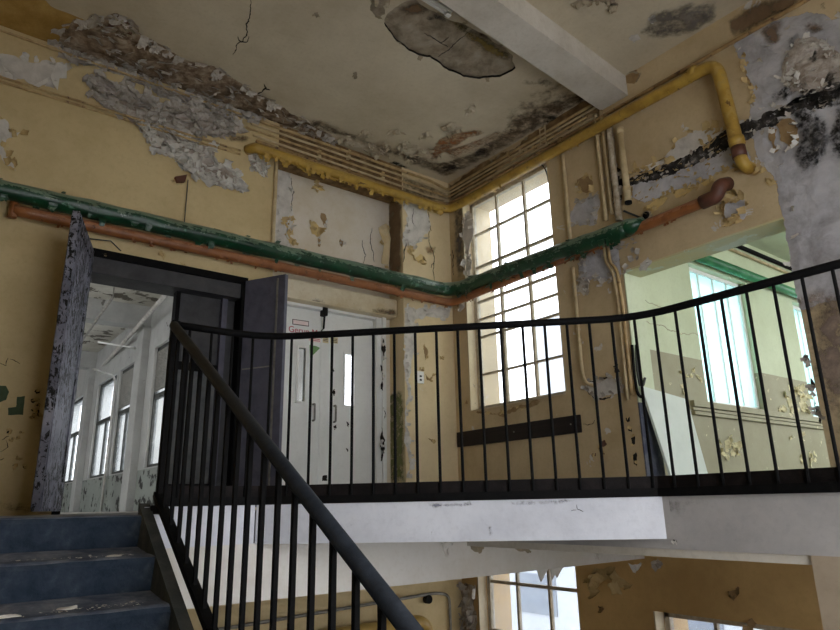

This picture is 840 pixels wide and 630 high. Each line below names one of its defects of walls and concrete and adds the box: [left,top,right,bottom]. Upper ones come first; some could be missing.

crack [233,0,251,54]
damp [646,5,713,36]
spalling [0,13,441,247]
peeling [369,189,444,265]
damp [378,96,582,202]
spalling [605,119,739,214]
peeling [713,188,749,227]
spalling [734,11,840,310]
mould [777,73,840,167]
spalling [395,231,652,478]
peeling [778,378,825,423]
peeling [719,435,742,461]